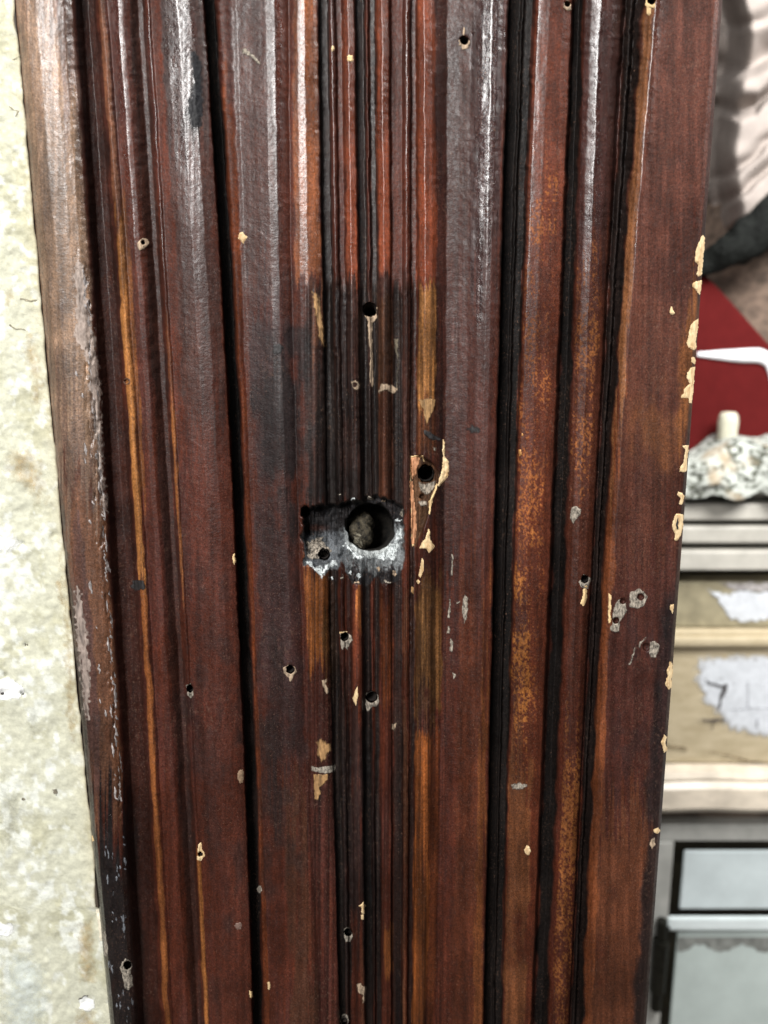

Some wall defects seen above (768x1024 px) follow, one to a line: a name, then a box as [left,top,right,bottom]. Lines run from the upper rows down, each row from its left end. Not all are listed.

peeling [424,430,449,486]
peeling [672,514,683,541]
spalling [608,589,647,632]
spalling [629,640,659,665]